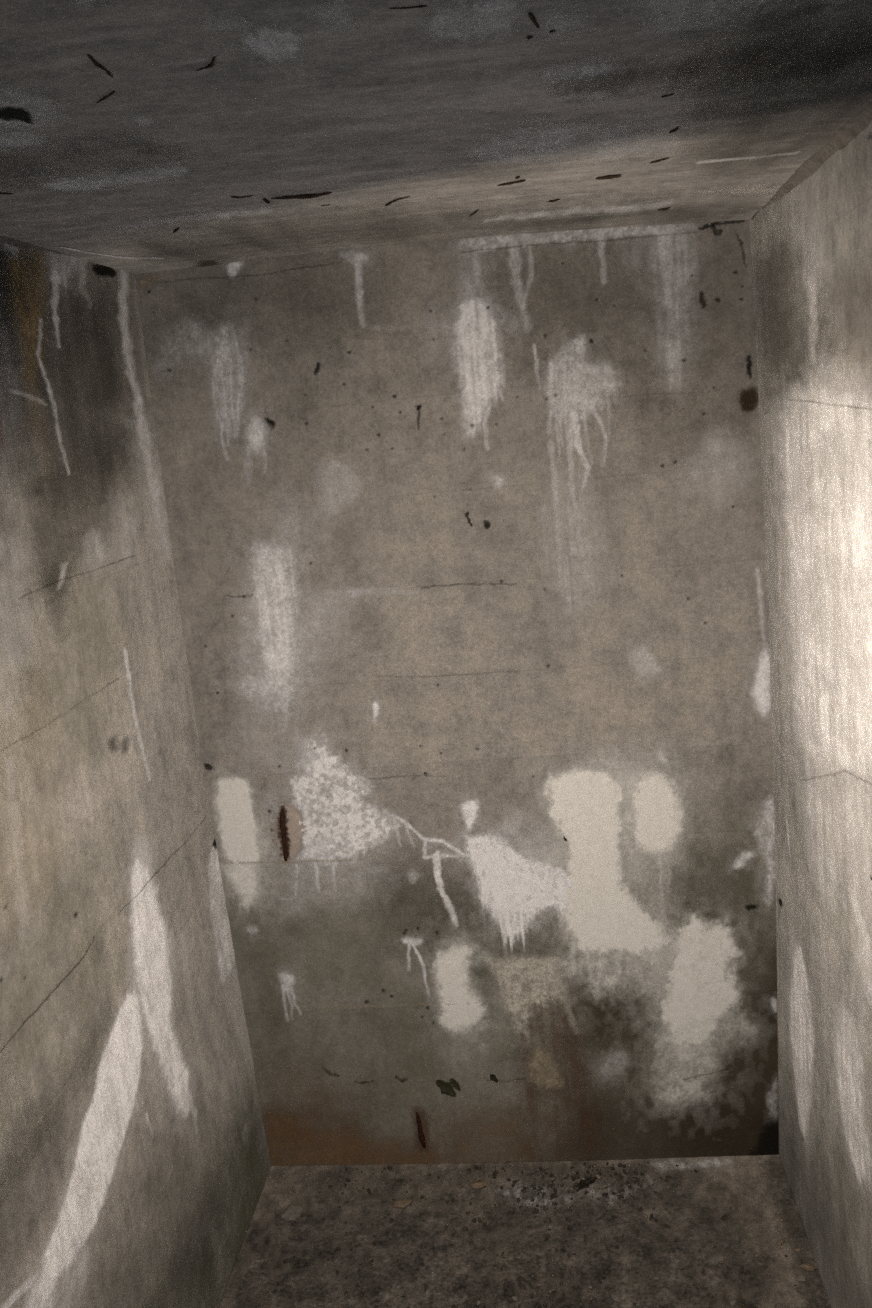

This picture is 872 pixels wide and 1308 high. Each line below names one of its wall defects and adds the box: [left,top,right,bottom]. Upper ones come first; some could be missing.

efflorescence [460,224,688,313]
leakage [37,247,159,500]
leakage [212,328,266,455]
efflorescence [453,297,505,436]
leakage [534,339,615,482]
efflorescence [780,387,872,772]
efflorescence [209,776,269,980]
rust [278,809,288,861]
leakage [279,972,298,1017]
leakage [290,734,814,1160]
efflorescence [3,854,191,1308]
rust [415,1110,427,1149]